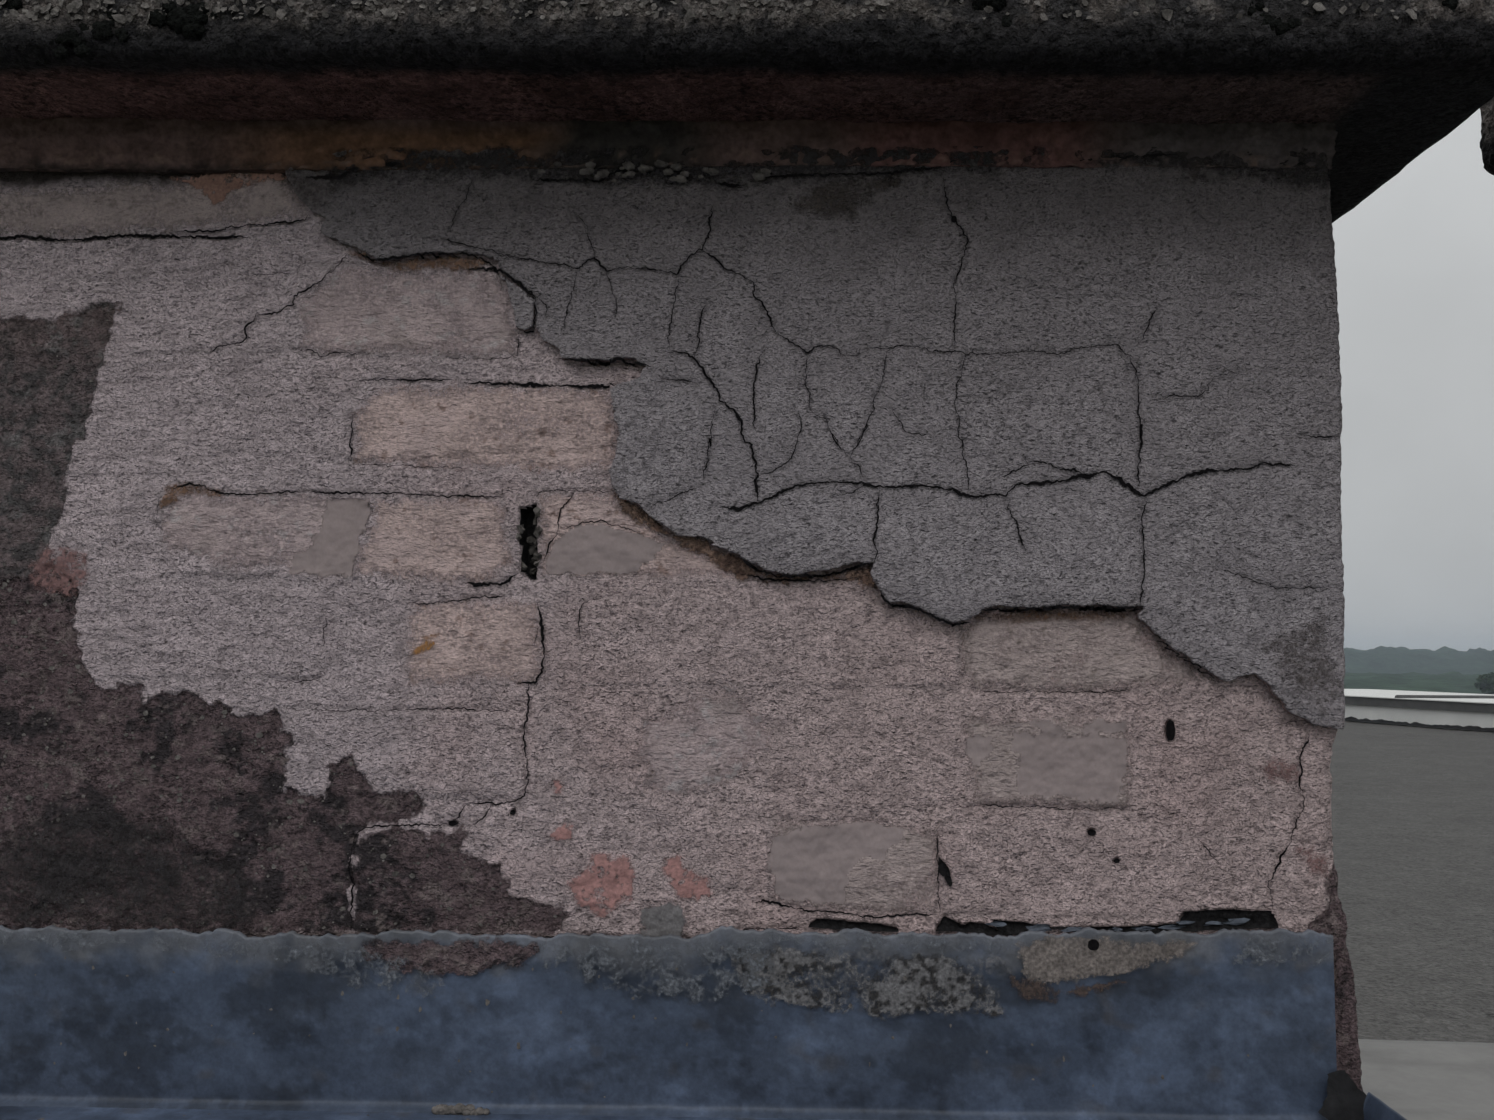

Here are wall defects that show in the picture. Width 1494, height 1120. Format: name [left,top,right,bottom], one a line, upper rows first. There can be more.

peeling [0,301,569,976]
spalling [300,267,535,358]
spalling [353,382,617,473]
crack [0,159,1339,936]